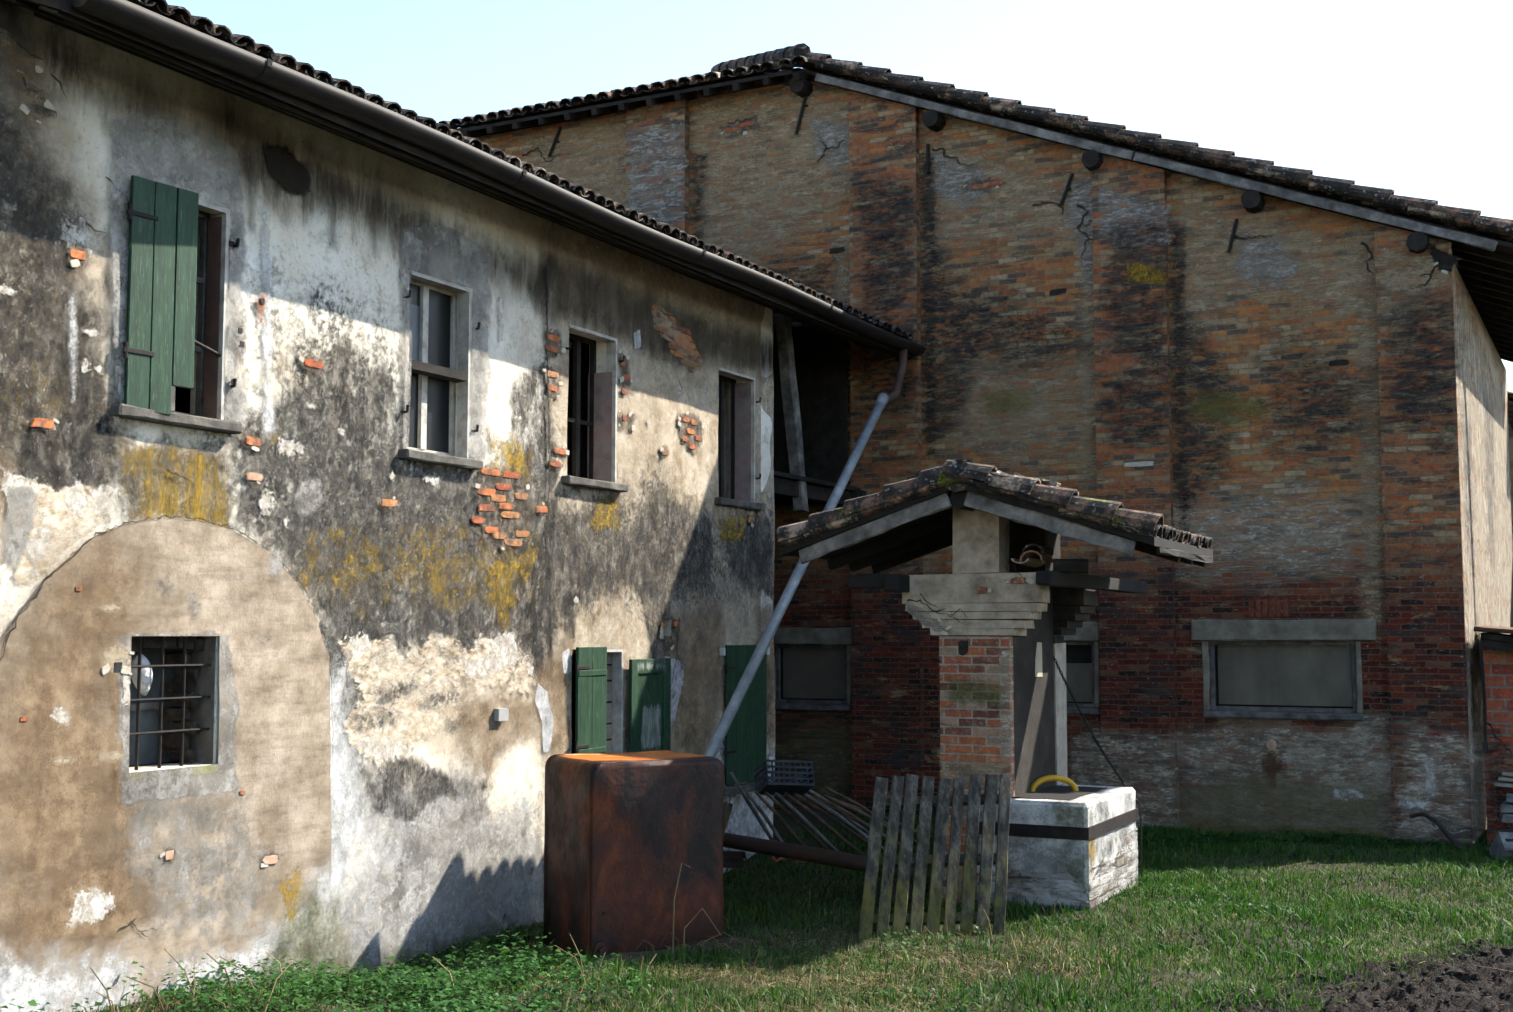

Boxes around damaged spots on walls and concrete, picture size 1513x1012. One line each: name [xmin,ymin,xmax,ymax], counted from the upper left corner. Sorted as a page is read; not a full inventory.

leakage [0,0,806,526]
flaking render [542,329,566,399]
flaking render [660,411,704,460]
leakage [851,159,1094,455]
leakage [1098,222,1232,531]
flaking render [0,468,123,610]
flaking render [471,466,548,556]
flaking render [337,630,540,772]
leakage [0,547,269,1012]
leakage [158,589,577,997]
leakage [1072,716,1513,845]
flaking render [67,885,115,928]